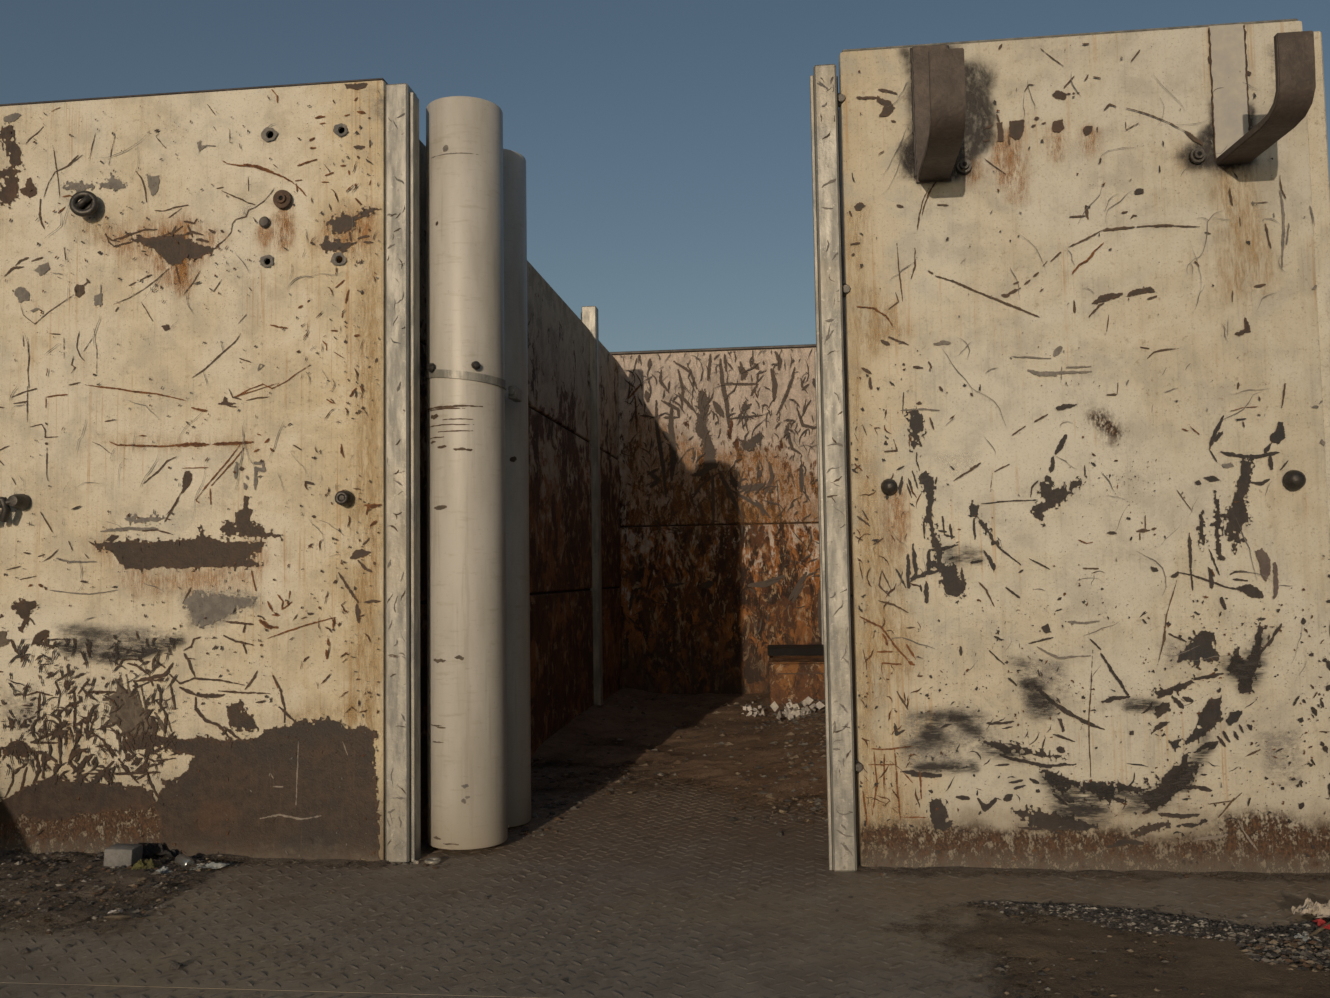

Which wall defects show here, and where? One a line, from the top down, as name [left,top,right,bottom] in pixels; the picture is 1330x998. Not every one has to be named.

peeling [0,122,37,208]
spalling [104,219,224,283]
peeling [90,471,283,574]
rust [629,414,818,523]
peeling [895,392,1087,604]
peeling [1195,422,1289,599]
peeling [183,589,257,629]
rust [0,798,185,858]
peeling [903,770,942,778]
rust [860,758,1330,876]
peeling [926,618,1282,849]